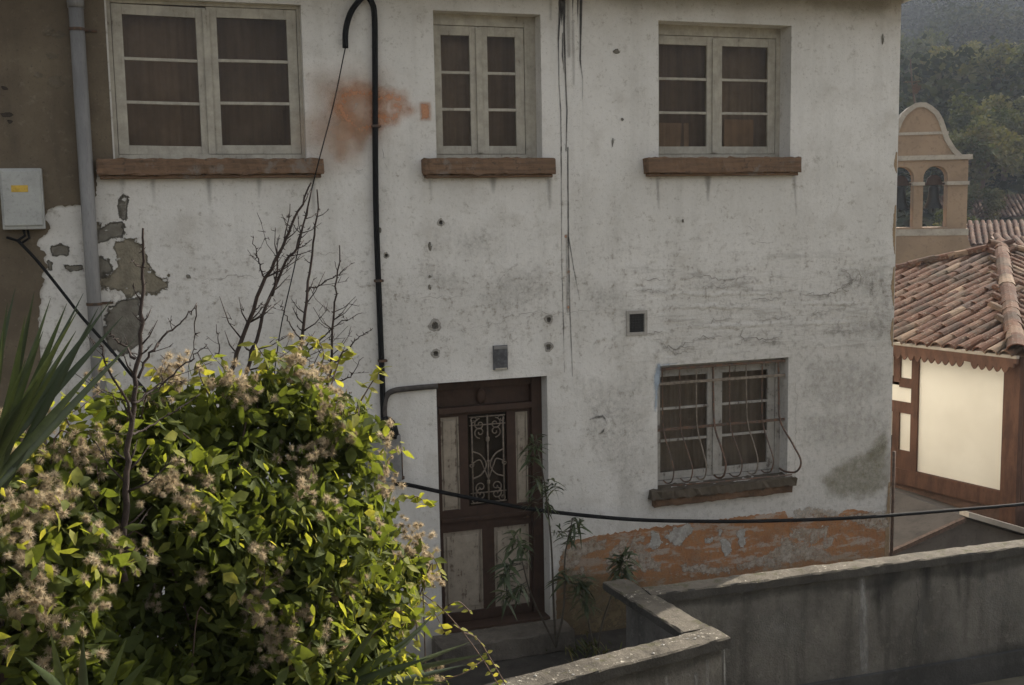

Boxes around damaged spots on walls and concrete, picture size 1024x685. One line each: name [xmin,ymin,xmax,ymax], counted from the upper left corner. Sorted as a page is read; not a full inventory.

rust [324,89,429,142]
peeling [47,233,83,272]
peeling [97,194,170,356]
peeling [562,523,693,579]
peeling [681,507,889,575]